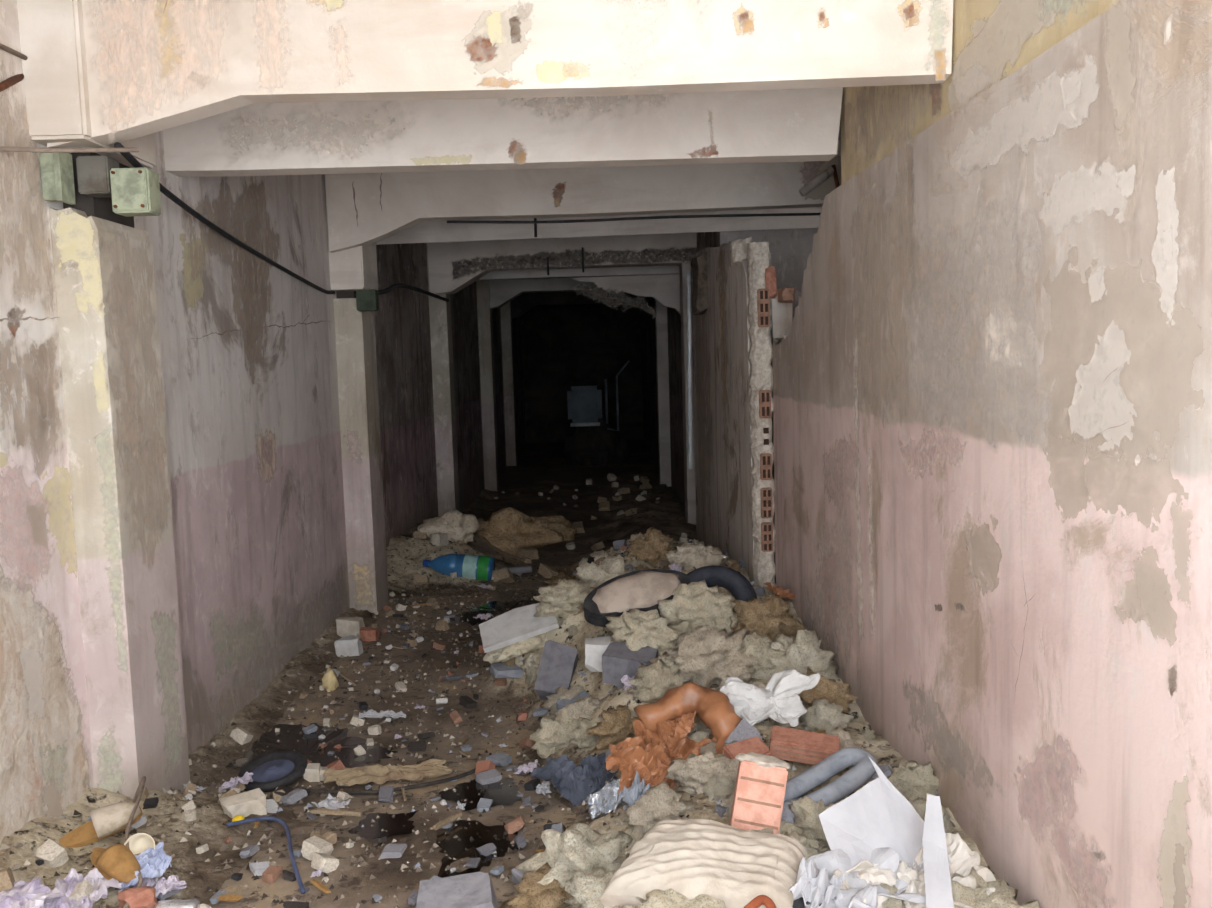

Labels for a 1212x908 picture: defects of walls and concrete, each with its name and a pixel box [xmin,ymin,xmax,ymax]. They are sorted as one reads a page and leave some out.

spalling [465,4,533,88]
peeling [536,60,590,84]
rust [734,7,754,34]
crack [0,315,60,323]
peeling [1039,159,1204,647]
peeling [42,466,78,578]
peeling [966,514,1002,596]
spalling [0,567,89,843]
spalling [1168,665,1176,696]